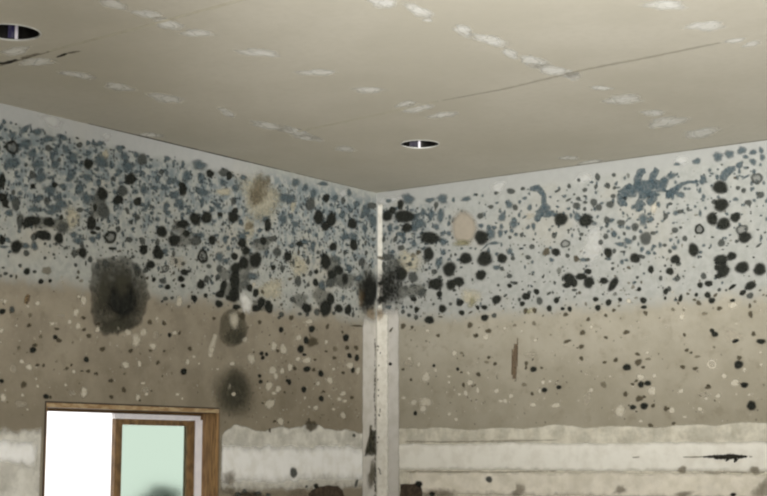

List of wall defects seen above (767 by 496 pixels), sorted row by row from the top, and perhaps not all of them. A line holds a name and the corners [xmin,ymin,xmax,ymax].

crack [0,53,39,64]
water stain [0,119,767,360]
water stain [325,331,359,374]
water stain [219,374,268,416]